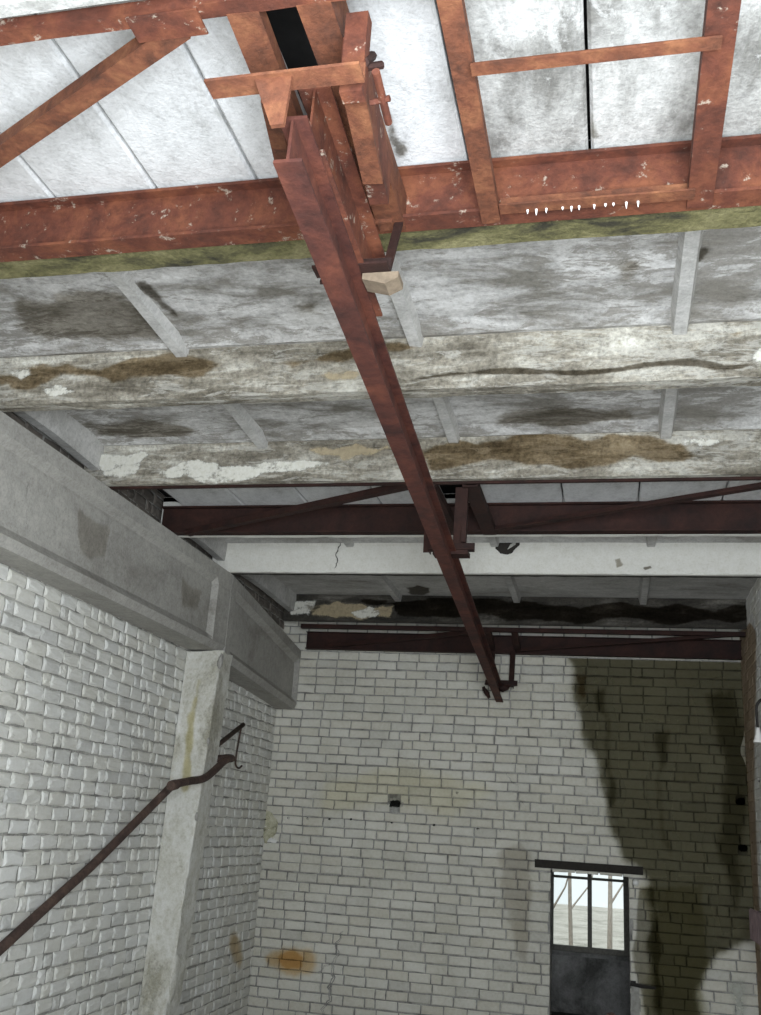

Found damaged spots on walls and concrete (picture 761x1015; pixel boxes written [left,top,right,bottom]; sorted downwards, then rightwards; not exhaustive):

damp [138,283,176,315]
damp [45,385,71,397]
spalling [99,451,148,478]
spalling [160,459,327,484]
damp [362,585,461,617]
damp [473,598,747,624]
damp [570,658,754,1015]